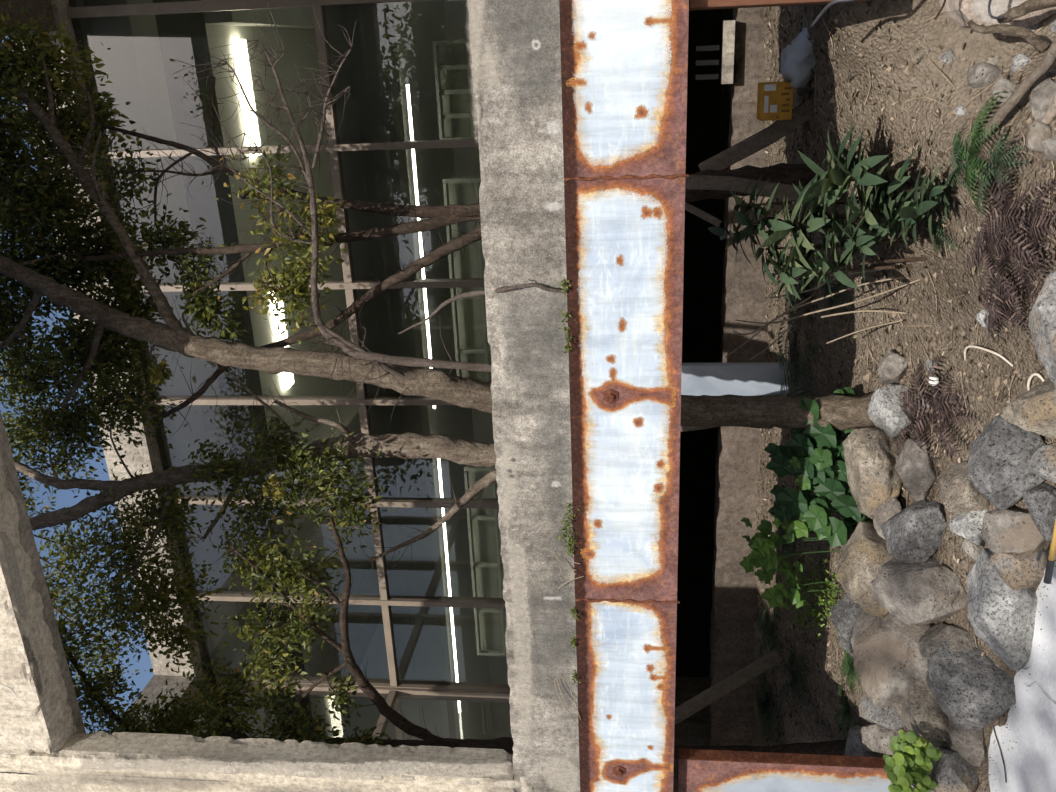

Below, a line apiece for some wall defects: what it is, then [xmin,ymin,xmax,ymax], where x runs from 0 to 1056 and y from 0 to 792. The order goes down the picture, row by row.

corrosion [559,0,888,792]